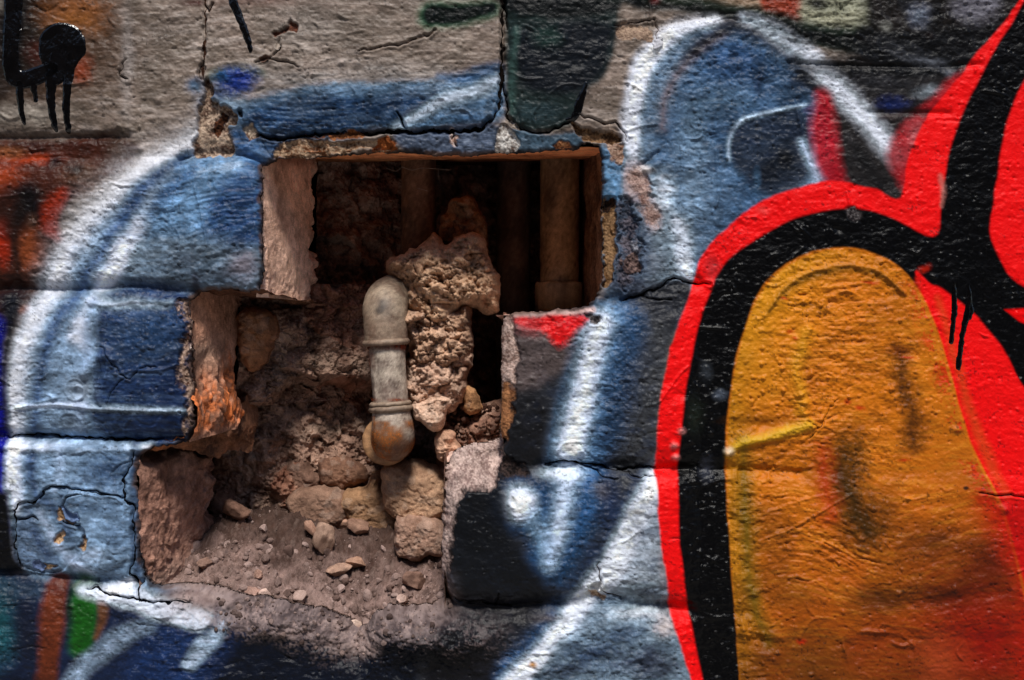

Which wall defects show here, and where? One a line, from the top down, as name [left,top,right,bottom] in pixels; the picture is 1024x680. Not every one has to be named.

crack [199,0,212,79]
peeling [583,313,602,325]
crack [622,277,708,301]
spalling [174,297,194,436]
rust [370,421,415,462]
spalling [441,315,531,593]
crack [11,433,191,605]
peeling [587,581,607,601]